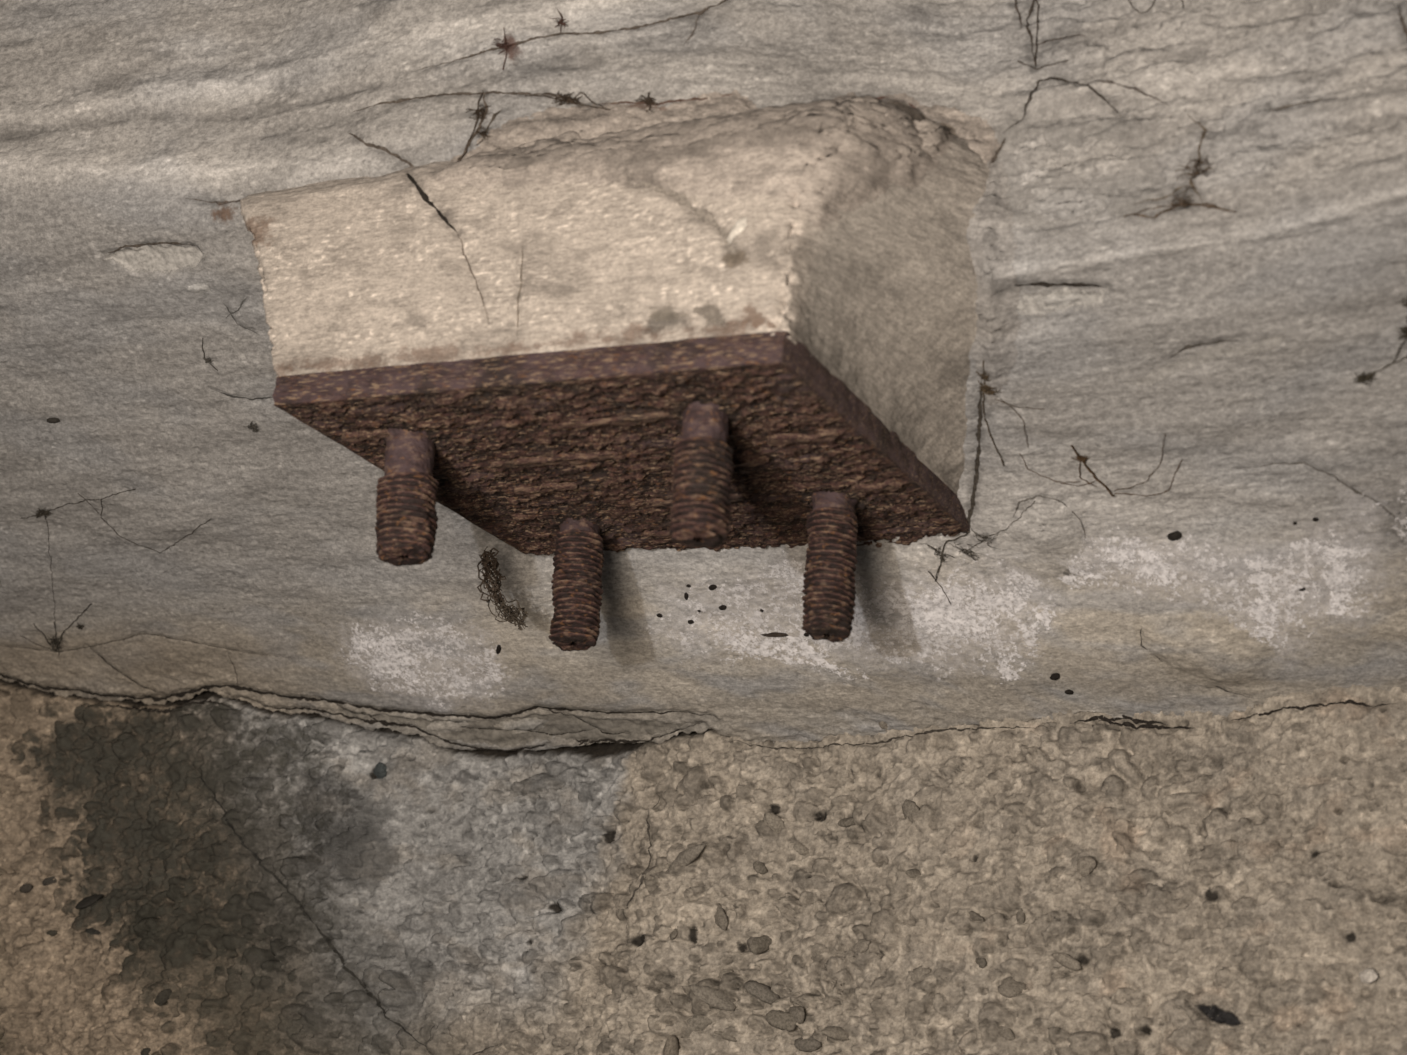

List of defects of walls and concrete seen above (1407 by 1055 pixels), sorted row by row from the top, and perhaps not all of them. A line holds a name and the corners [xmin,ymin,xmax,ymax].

crack [349,0,734,331]
crack [989,0,1234,219]
corrosion [341,429,390,443]
corrosion [490,451,618,469]
corrosion [557,412,675,429]
corrosion [767,429,839,446]
crack [967,380,983,527]
damp [646,503,1381,684]
damp [341,612,510,714]
crack [0,633,1191,752]
crack [1231,699,1396,721]
damp [12,701,347,1055]